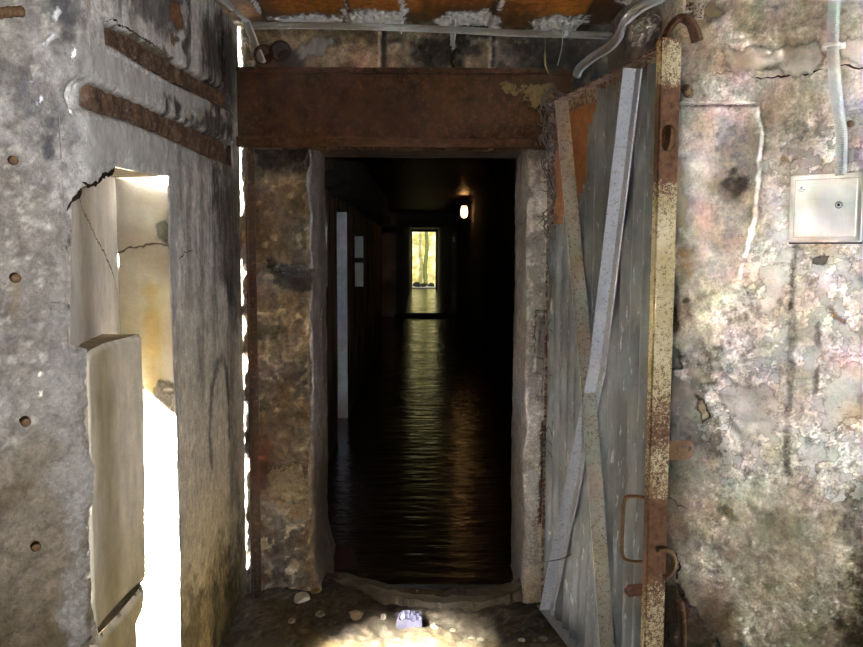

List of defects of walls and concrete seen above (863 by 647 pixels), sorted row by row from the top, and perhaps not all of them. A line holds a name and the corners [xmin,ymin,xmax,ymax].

leakage [42,0,75,45]
spalling [112,0,185,61]
leakage [132,0,191,68]
leakage [161,10,239,139]
crack [709,64,863,80]
leakage [721,168,750,202]
crack [65,166,193,296]
crack [142,386,150,421]
spalling [149,380,175,442]
spalling [663,579,720,647]